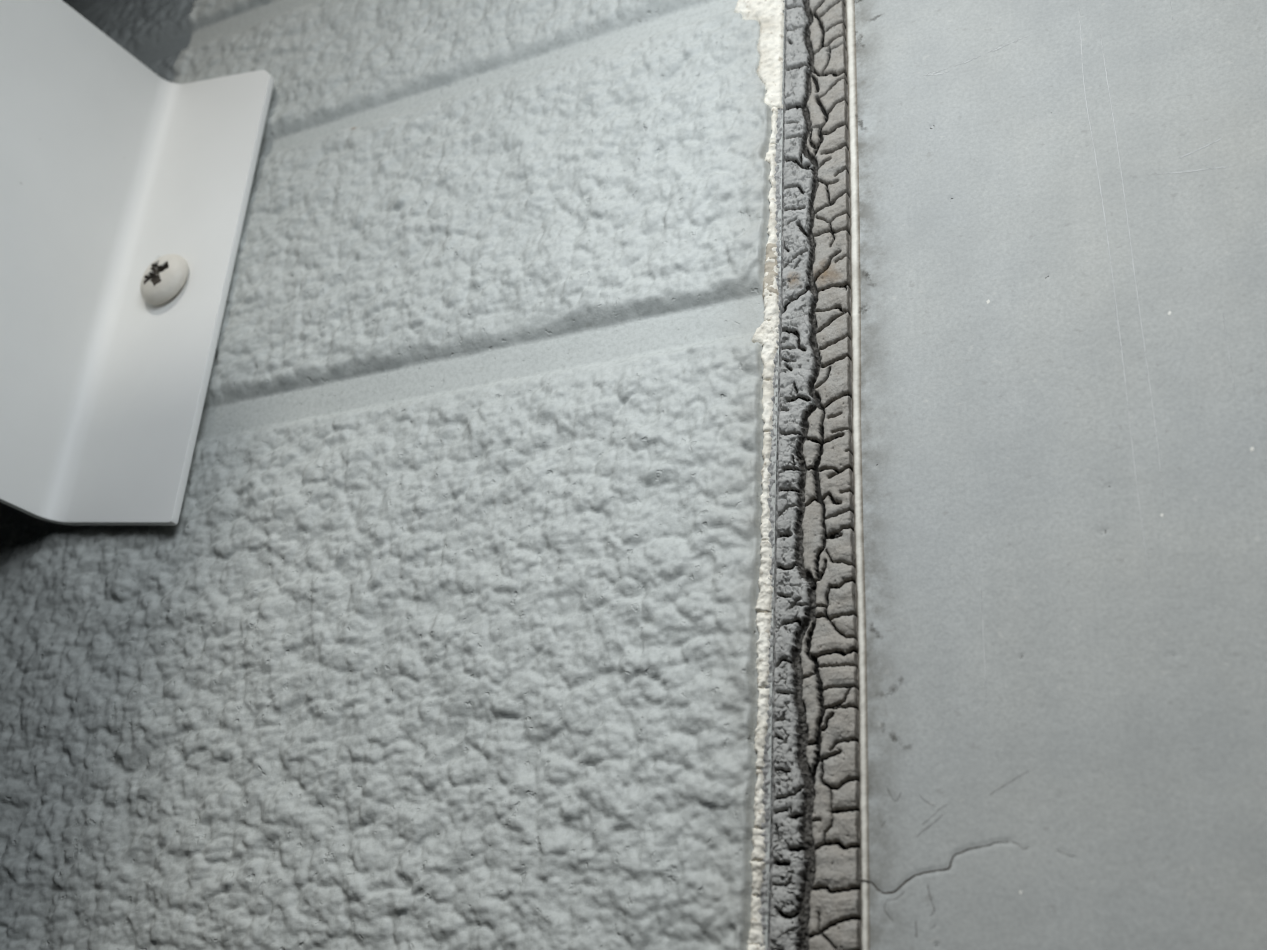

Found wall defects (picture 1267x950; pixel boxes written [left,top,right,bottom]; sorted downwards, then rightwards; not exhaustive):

spalling [734,0,785,950]
crack [774,0,997,950]